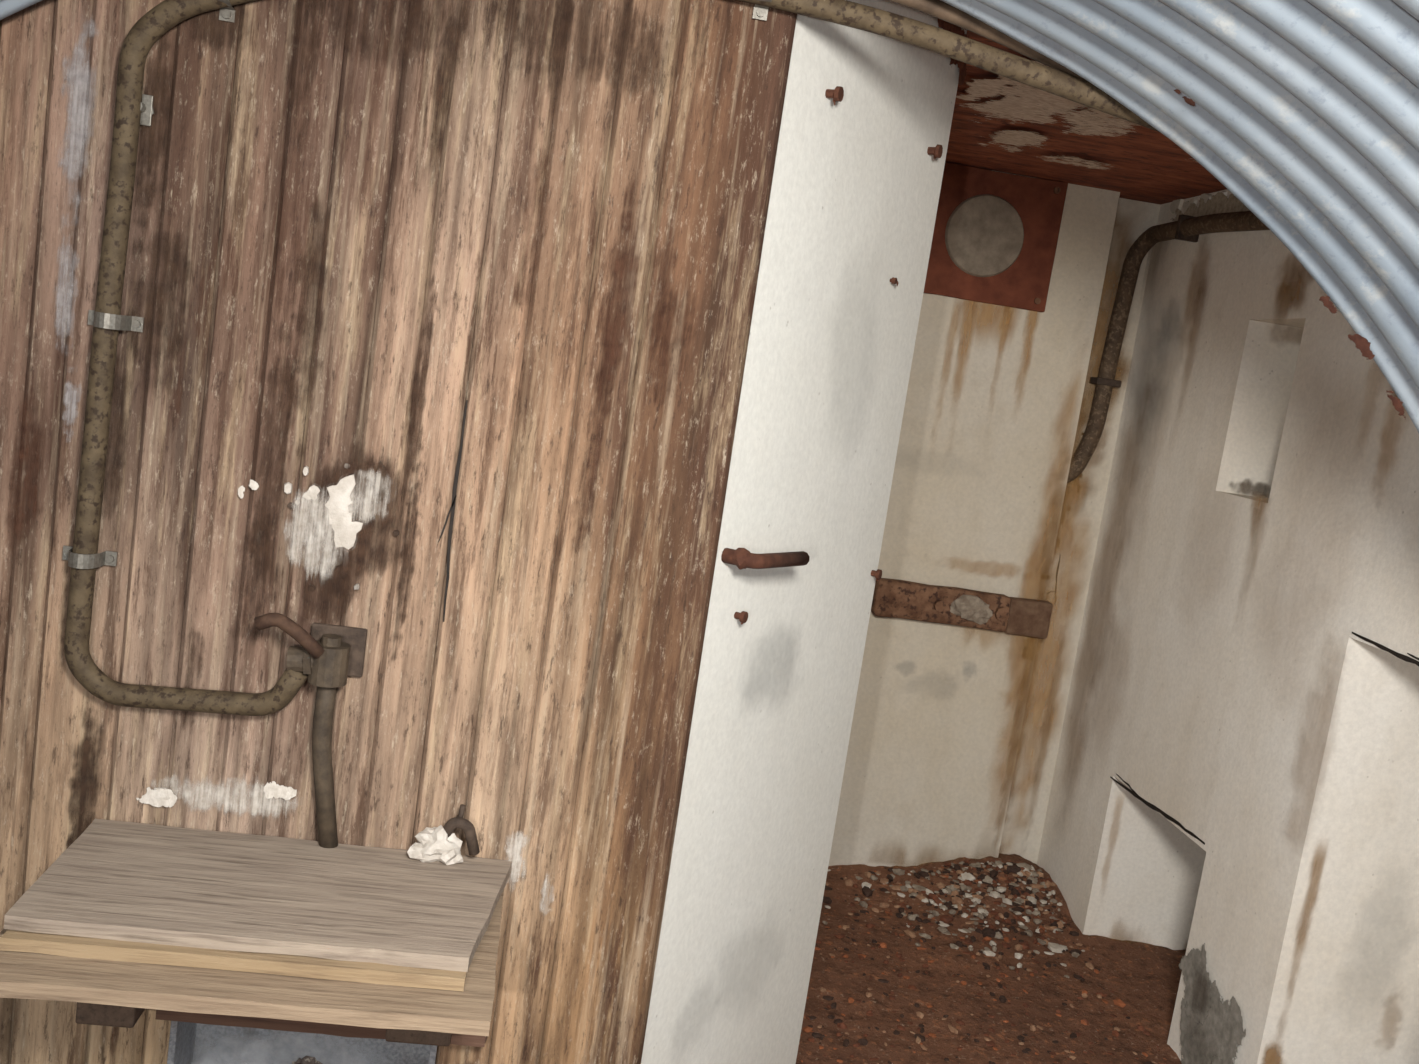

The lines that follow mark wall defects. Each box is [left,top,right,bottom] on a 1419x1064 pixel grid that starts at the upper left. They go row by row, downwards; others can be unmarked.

peeling [937,18,969,38]
peeling [950,58,1141,170]
corrosion [960,300,1012,366]
corrosion [1025,311,1037,368]
corrosion [1319,296,1337,314]
corrosion [1348,334,1375,360]
corrosion [1386,390,1406,418]
peeling [238,479,259,498]
spalling [284,447,406,601]
corrosion [871,499,1057,775]